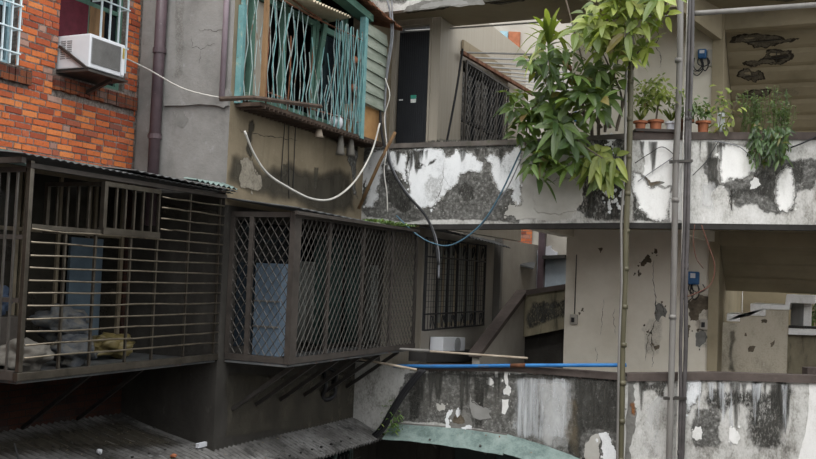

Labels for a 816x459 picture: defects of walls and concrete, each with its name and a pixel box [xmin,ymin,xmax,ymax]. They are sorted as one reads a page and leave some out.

spalling [729,33,799,98]
peeling [239,157,262,194]
damp [230,120,519,223]
peeling [362,144,584,222]
peeling [715,144,761,189]
peeling [774,165,797,215]
crack [645,262,665,365]
peeling [688,294,708,350]
damp [393,371,617,459]
peeling [584,381,637,459]
damp [691,381,791,448]